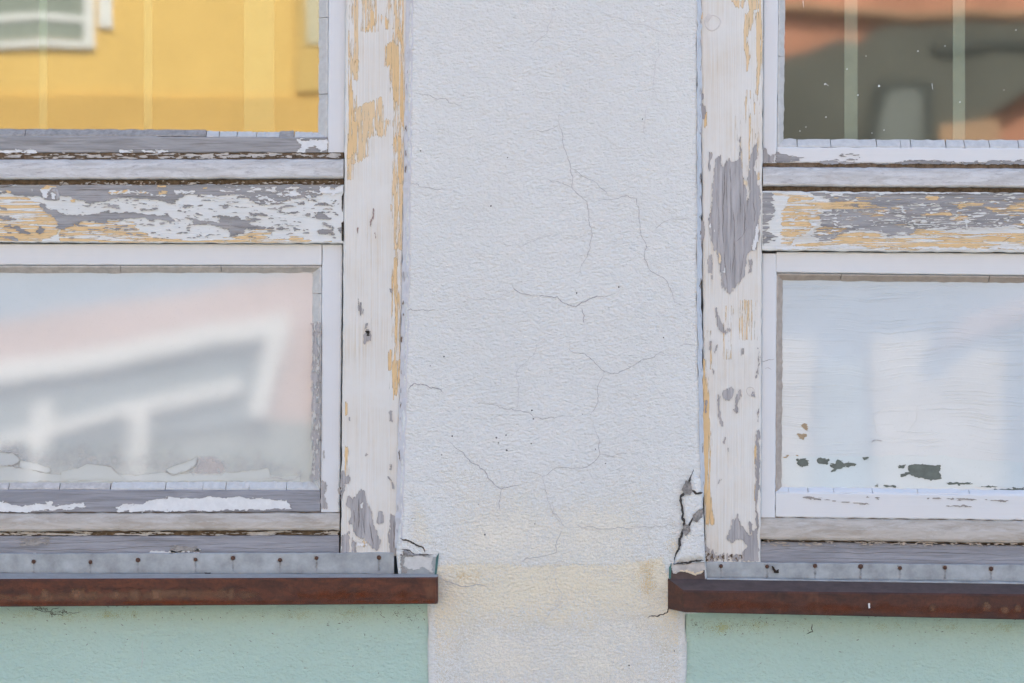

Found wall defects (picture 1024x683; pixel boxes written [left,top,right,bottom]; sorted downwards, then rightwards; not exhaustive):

rust [69,589,234,604]
peeling [0,0,405,422]
peeling [0,321,433,573]
crack [397,505,433,555]
crack [398,271,442,459]
crack [458,289,610,322]
crack [448,332,706,642]
crack [540,116,702,317]
peeling [681,0,1024,536]